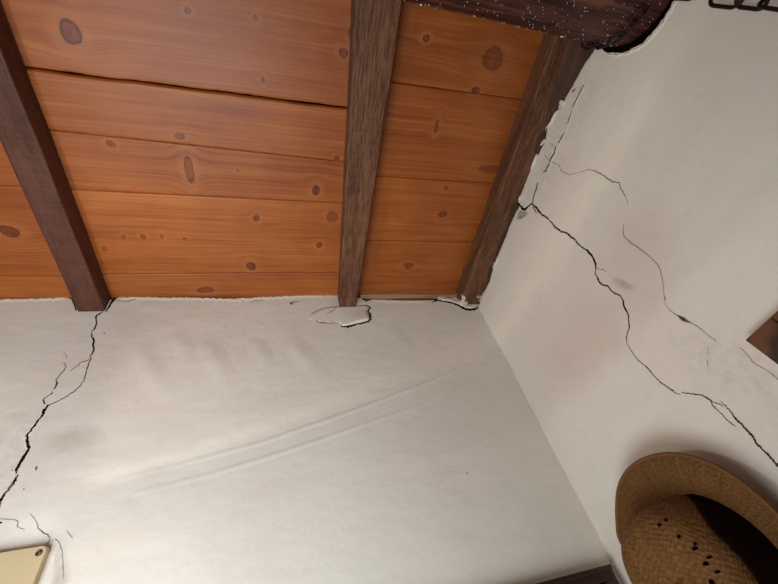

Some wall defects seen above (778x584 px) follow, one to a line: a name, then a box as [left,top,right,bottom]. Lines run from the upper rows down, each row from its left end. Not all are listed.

peeling [530,100,565,170]
crack [0,297,135,574]
flaking render [309,298,372,328]
crack [517,85,778,467]